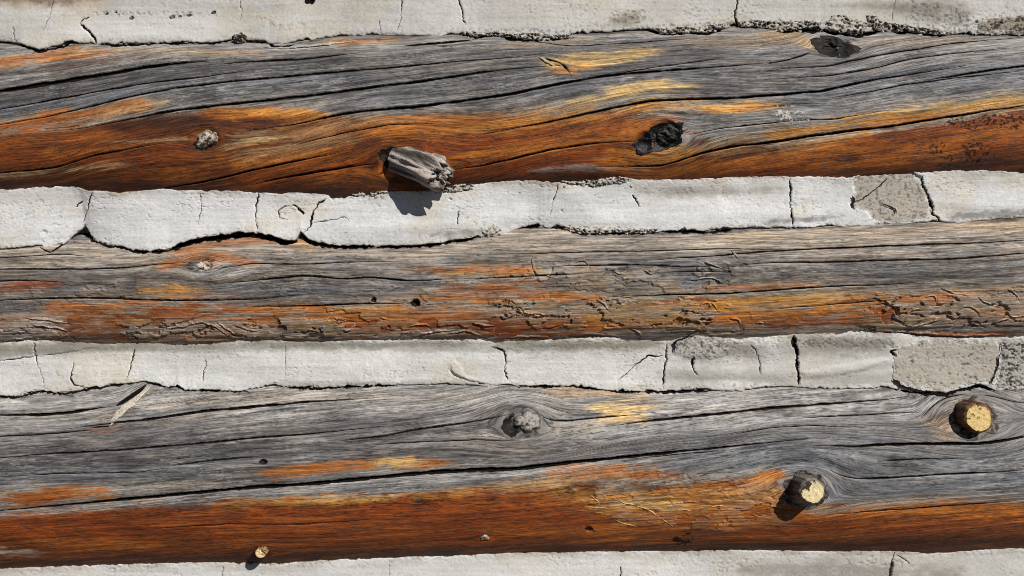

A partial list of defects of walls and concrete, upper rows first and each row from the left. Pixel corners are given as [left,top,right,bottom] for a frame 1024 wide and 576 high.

crack [0,0,1024,233]
crack [0,176,1024,309]
spalling [850,172,930,224]
crack [0,335,1024,511]
spalling [892,337,1024,392]